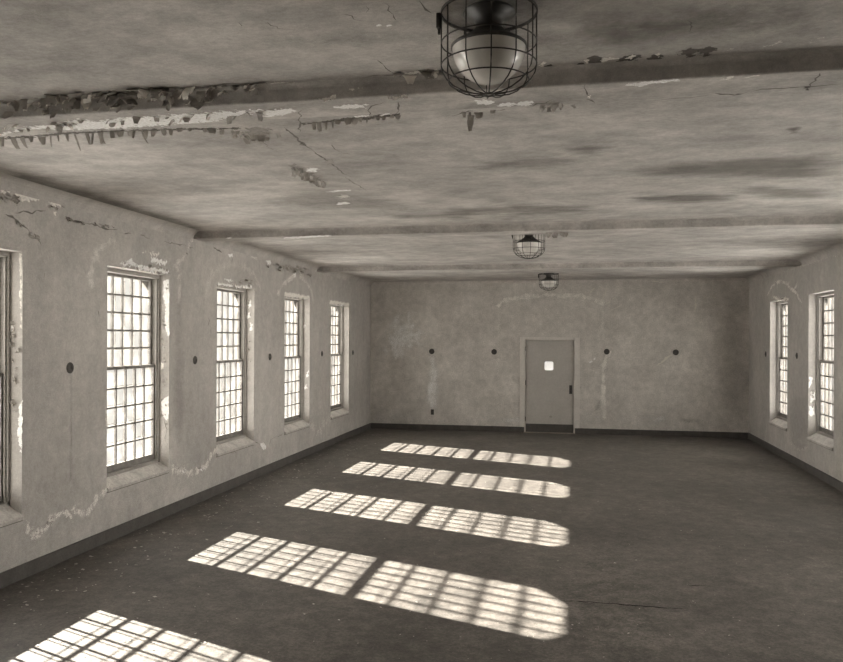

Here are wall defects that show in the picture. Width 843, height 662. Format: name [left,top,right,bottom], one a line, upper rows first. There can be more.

peeling [577,53,663,65]
peeling [0,82,296,151]
peeling [301,94,401,132]
peeling [454,99,576,132]
crack [663,73,835,100]
crack [285,110,362,188]
peeling [0,190,65,216]
peeling [290,165,351,205]
peeling [9,253,23,389]
peeling [120,240,193,348]
peeling [9,399,23,453]
peeling [160,380,169,436]